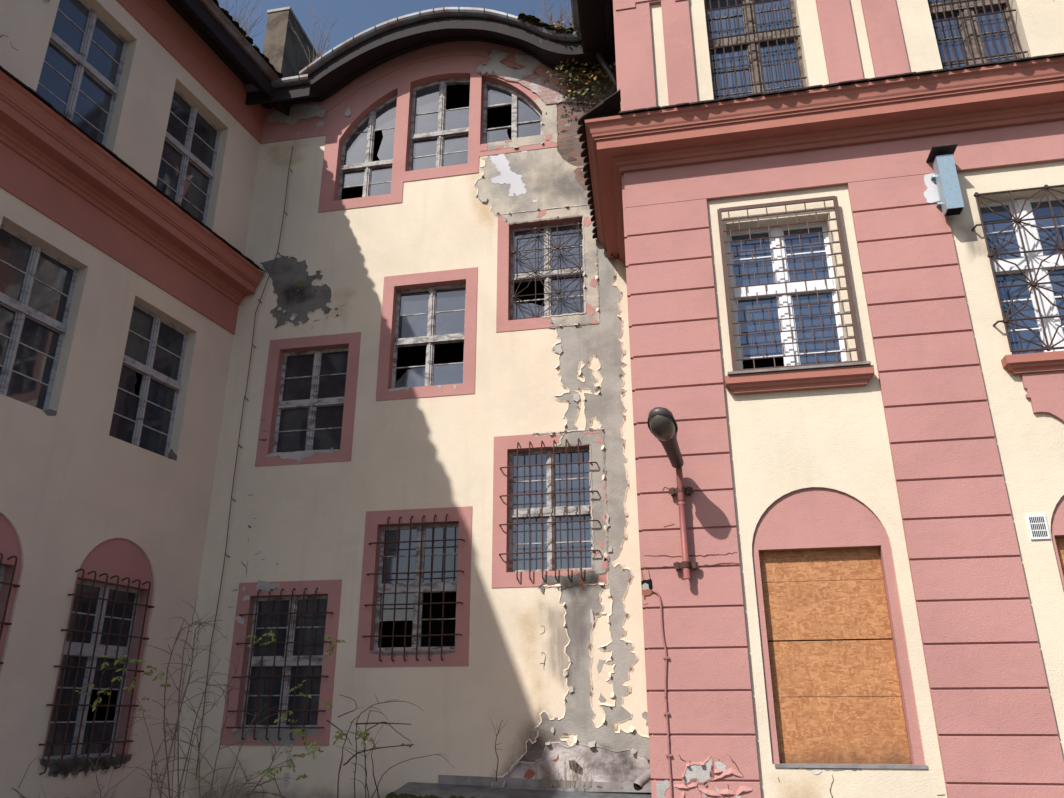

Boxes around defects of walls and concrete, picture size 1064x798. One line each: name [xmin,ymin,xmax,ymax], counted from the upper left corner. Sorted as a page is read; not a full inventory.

peeling [260,254,343,330]
peeling [473,48,726,798]
crack [641,552,739,607]